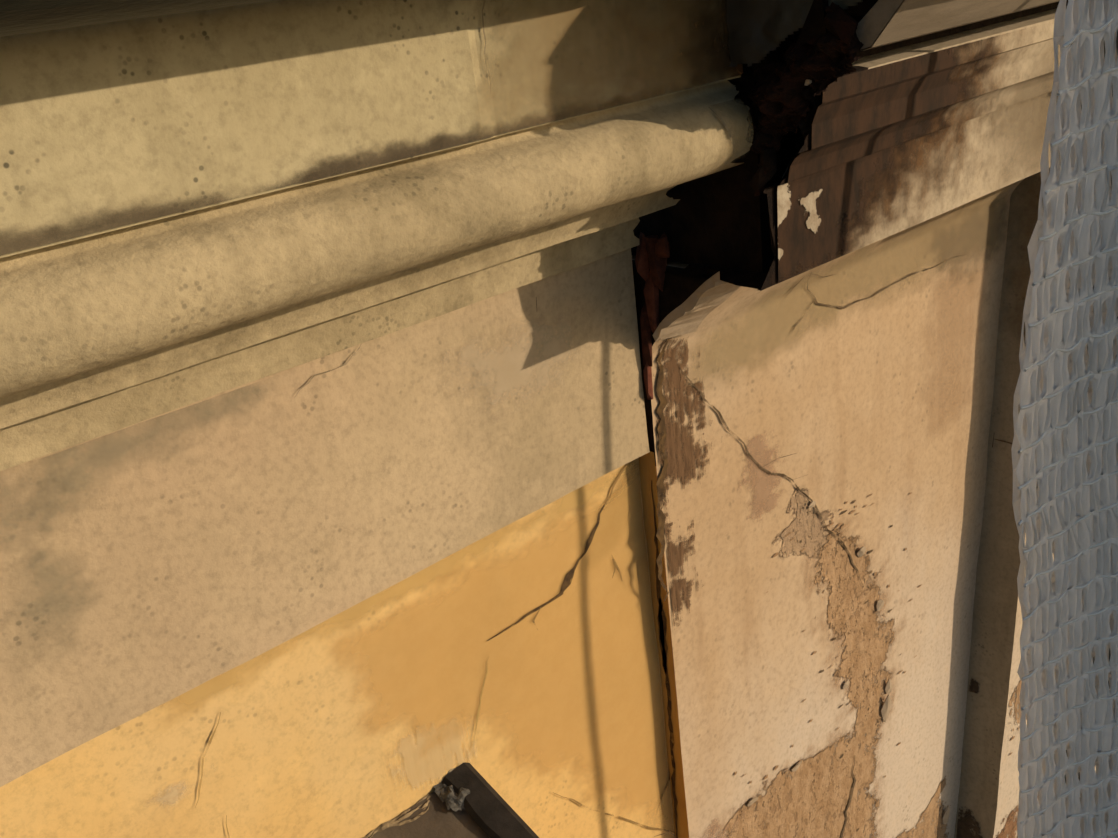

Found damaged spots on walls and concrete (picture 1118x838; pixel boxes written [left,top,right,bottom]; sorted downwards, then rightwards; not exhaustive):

spalling [635,232,740,400]
spalling [748,0,864,233]
crack [787,254,967,333]
water stain [777,36,1001,283]
water stain [1020,266,1031,330]
water stain [1025,191,1043,250]
crack [474,462,630,732]
crack [554,338,863,838]
flaking render [724,487,906,838]
crack [195,712,221,808]
flaking render [897,776,951,838]
flaking render [996,805,1025,838]